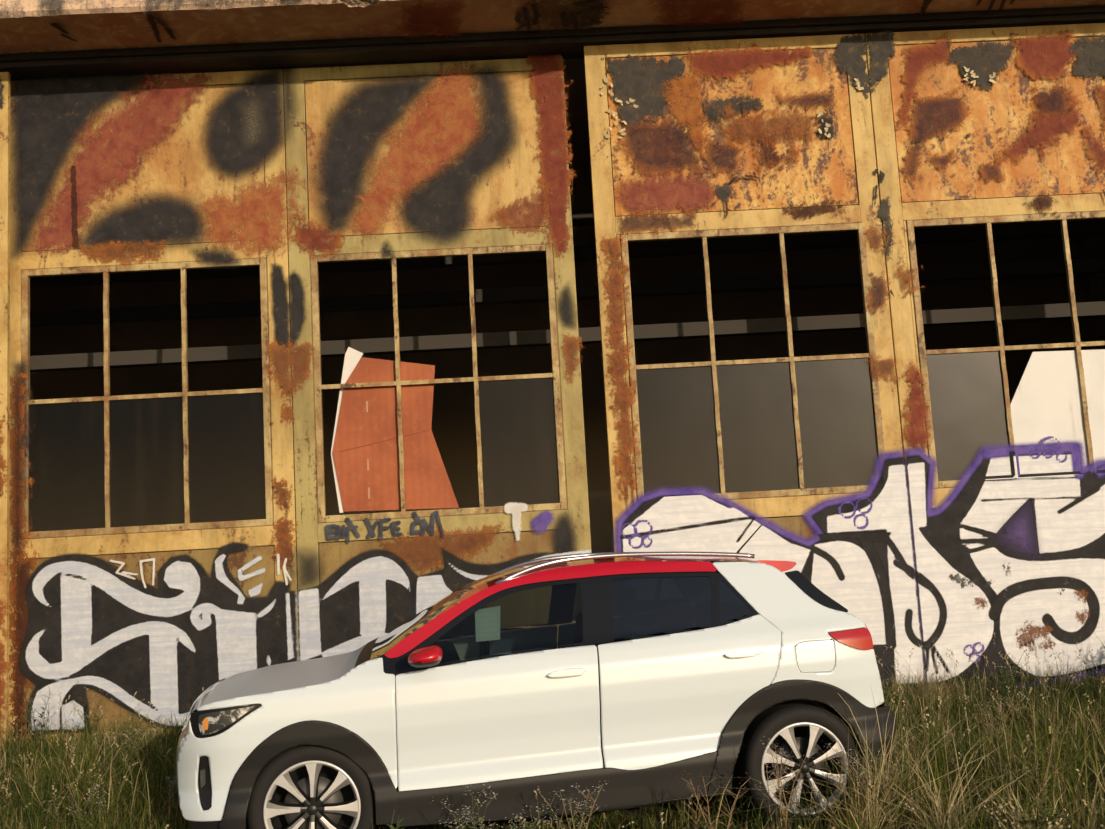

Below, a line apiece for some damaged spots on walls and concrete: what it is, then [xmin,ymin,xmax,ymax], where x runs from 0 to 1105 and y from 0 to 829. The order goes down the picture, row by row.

peeling [600,52,686,139]
peeling [816,110,836,140]
corrosion [901,85,974,186]
peeling [941,39,1015,92]
corrosion [980,83,1105,183]
corrosion [598,69,843,503]
corrosion [867,353,932,453]
corrosion [0,416,8,498]
corrosion [0,601,13,743]